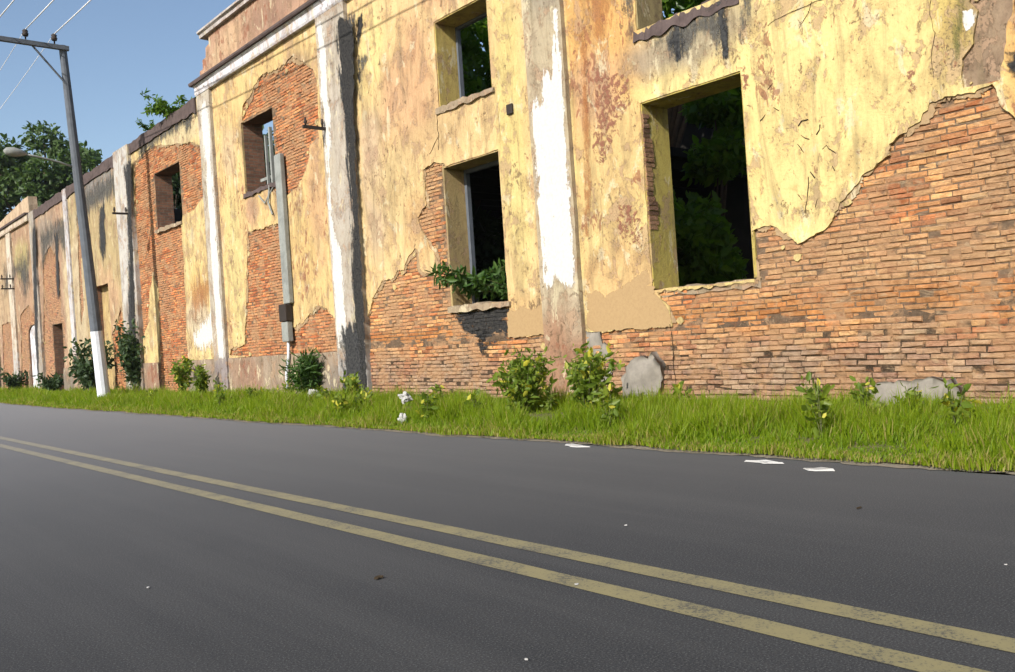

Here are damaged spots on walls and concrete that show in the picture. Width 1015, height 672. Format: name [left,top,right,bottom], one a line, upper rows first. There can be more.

flaking render [3,247,65,388]
flaking render [134,21,347,392]
water stain [336,12,368,393]
flaking render [368,162,547,398]
water stain [457,307,509,355]
peeling [531,7,575,289]
water stain [659,0,751,62]
flaking render [586,0,1015,406]
water stain [955,9,976,50]